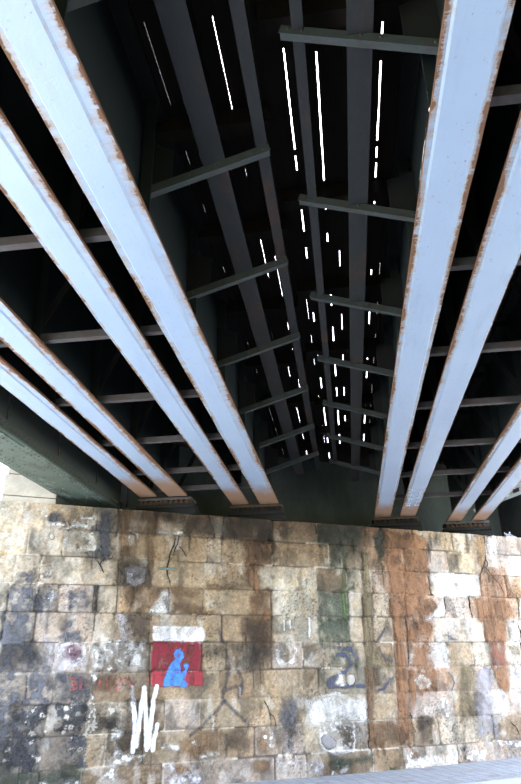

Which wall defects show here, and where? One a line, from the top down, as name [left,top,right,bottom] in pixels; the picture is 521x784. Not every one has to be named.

crack [166,538,187,586]
corrosion [362,528,437,757]
crack [468,537,521,646]
corrosion [477,535,520,697]